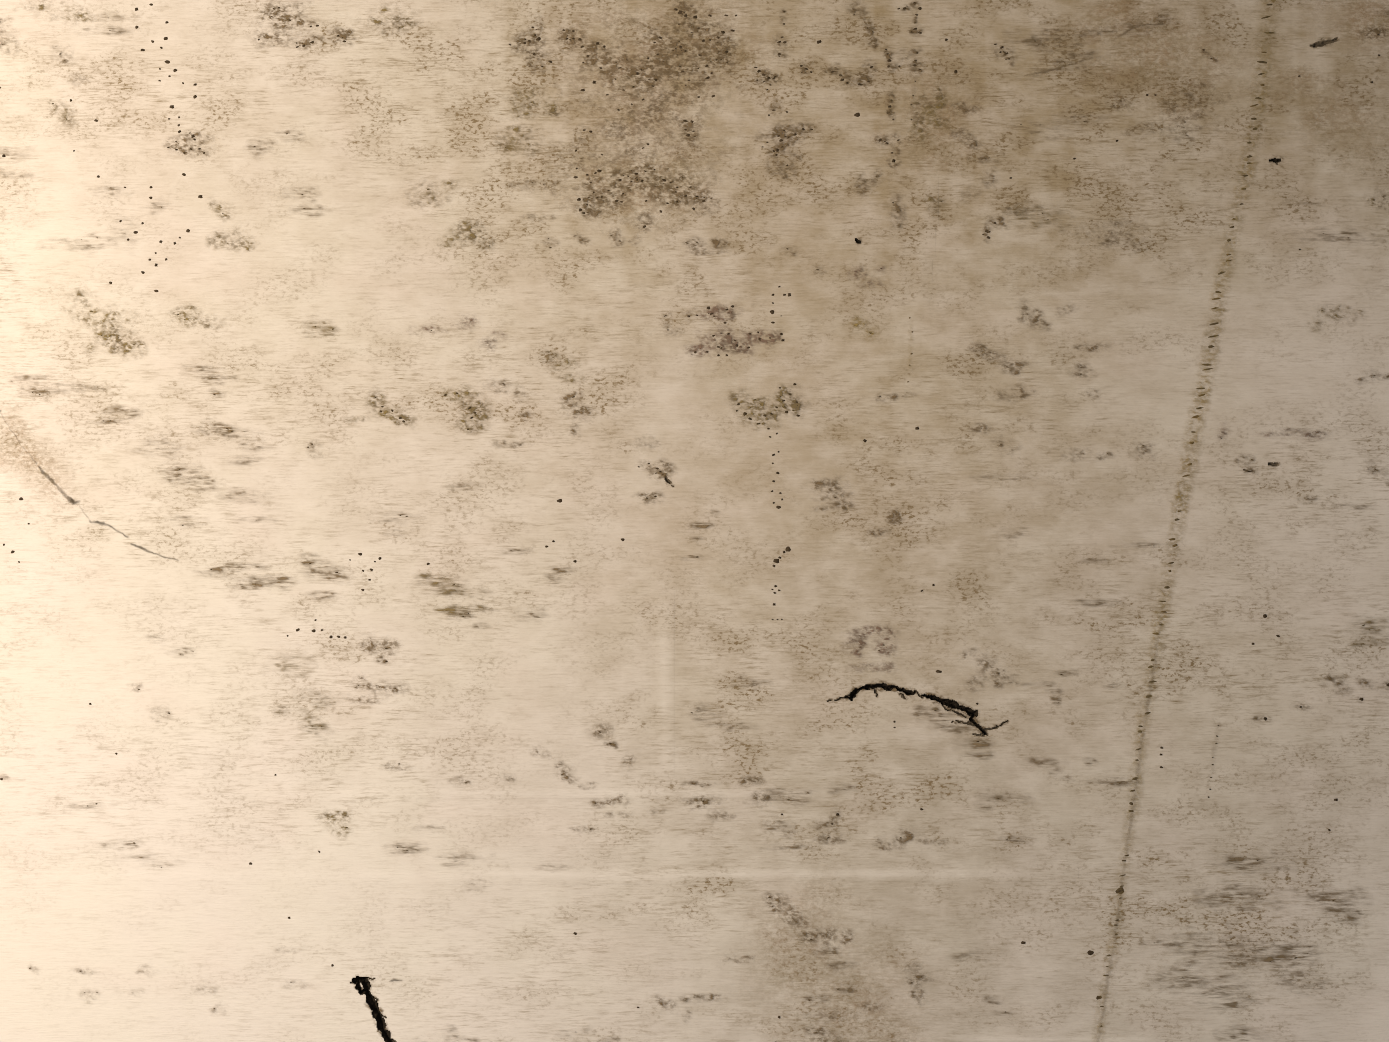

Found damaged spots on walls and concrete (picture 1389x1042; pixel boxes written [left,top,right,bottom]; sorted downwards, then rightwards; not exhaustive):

damp [509,26,552,67]
damp [558,2,737,111]
damp [800,2,922,86]
damp [505,92,557,152]
damp [762,106,813,179]
damp [573,129,712,228]
damp [444,221,492,249]
damp [687,305,784,356]
damp [444,390,488,430]
damp [546,351,590,432]
damp [730,383,801,430]
damp [638,461,671,501]